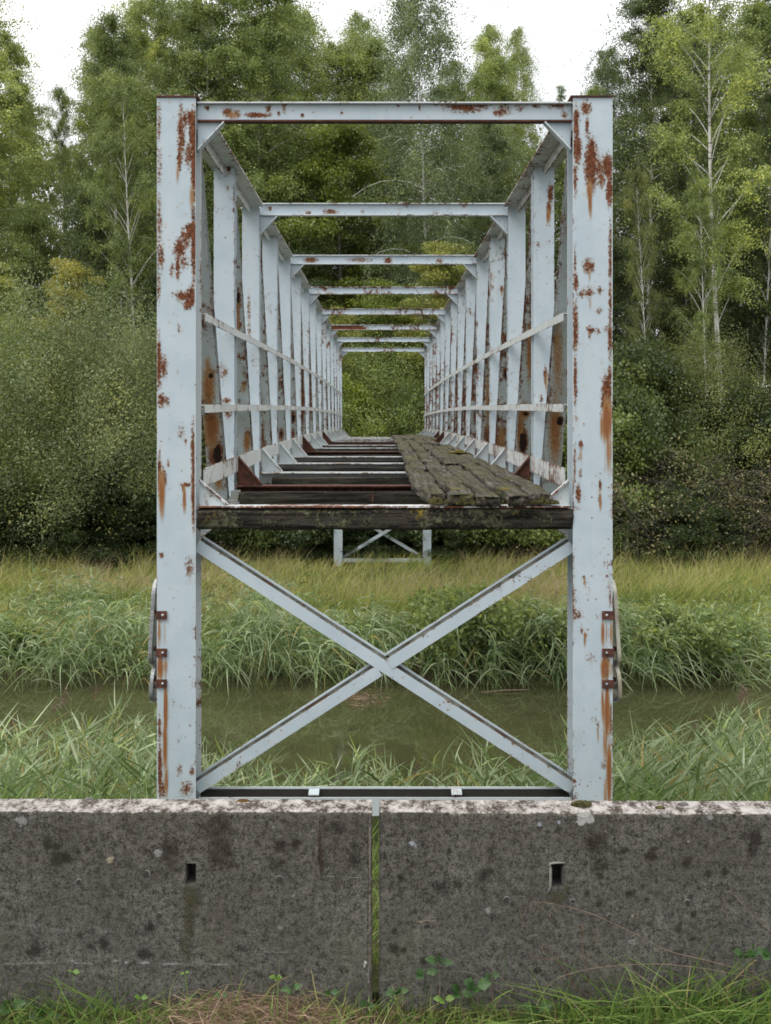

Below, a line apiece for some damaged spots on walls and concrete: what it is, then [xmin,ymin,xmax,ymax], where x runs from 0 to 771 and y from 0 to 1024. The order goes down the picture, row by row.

rust [223,104,287,119]
rust [157,325,169,409]
rust [157,102,209,311]
rust [158,359,247,531]
rust [243,421,265,452]
rust [443,99,612,468]
rust [157,657,194,799]
rust [580,621,612,801]